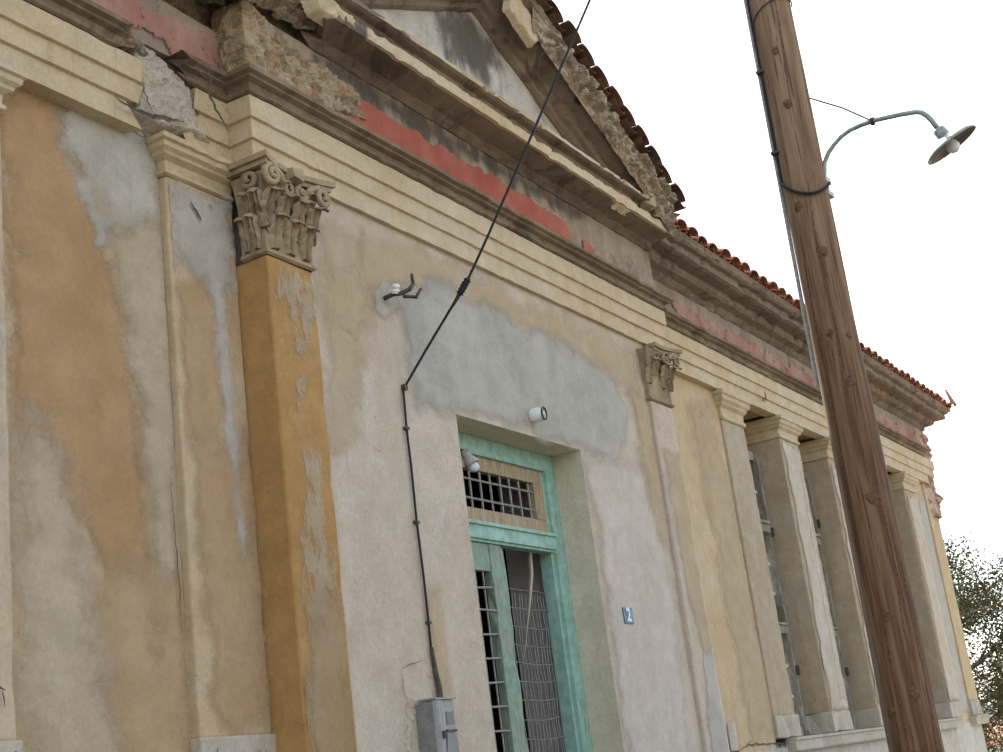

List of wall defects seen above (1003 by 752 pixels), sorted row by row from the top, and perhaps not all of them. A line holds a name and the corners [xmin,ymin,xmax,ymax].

spalling [91,0,571,241]
spalling [502,0,681,237]
crack [170,480,182,629]
peeling [301,452,337,652]